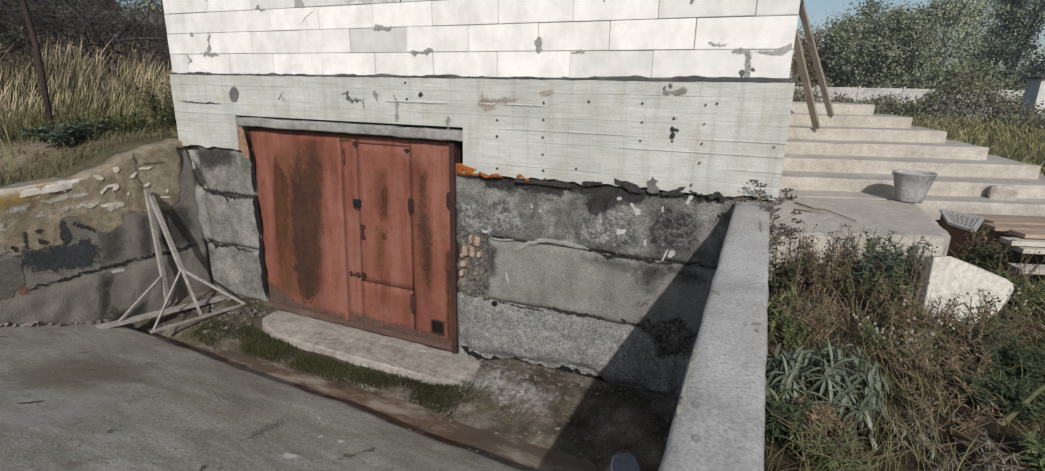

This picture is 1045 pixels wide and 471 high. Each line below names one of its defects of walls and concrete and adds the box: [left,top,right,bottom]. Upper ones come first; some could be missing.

peeling [0,144,181,299]
crack [27,150,267,299]
corrosion [417,175,431,282]
spalling [514,177,729,261]